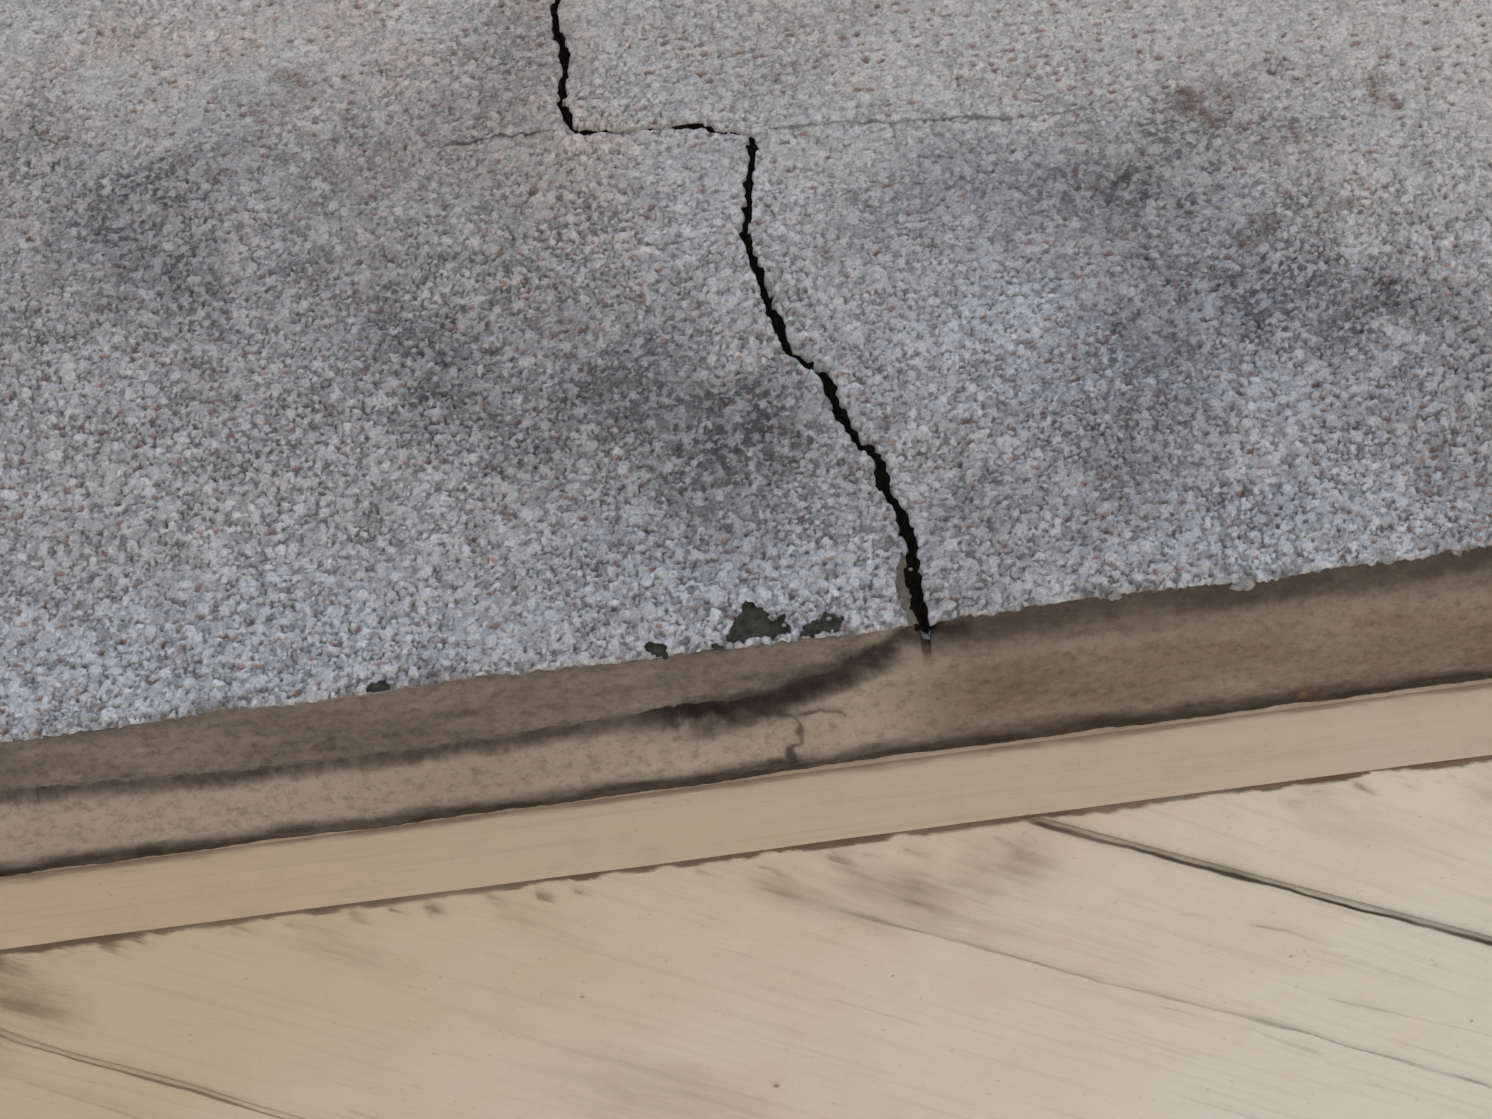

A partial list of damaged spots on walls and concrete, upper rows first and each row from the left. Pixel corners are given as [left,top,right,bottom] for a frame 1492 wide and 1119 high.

crack [458,0,936,633]
spalling [644,641,668,660]
spalling [711,600,844,651]